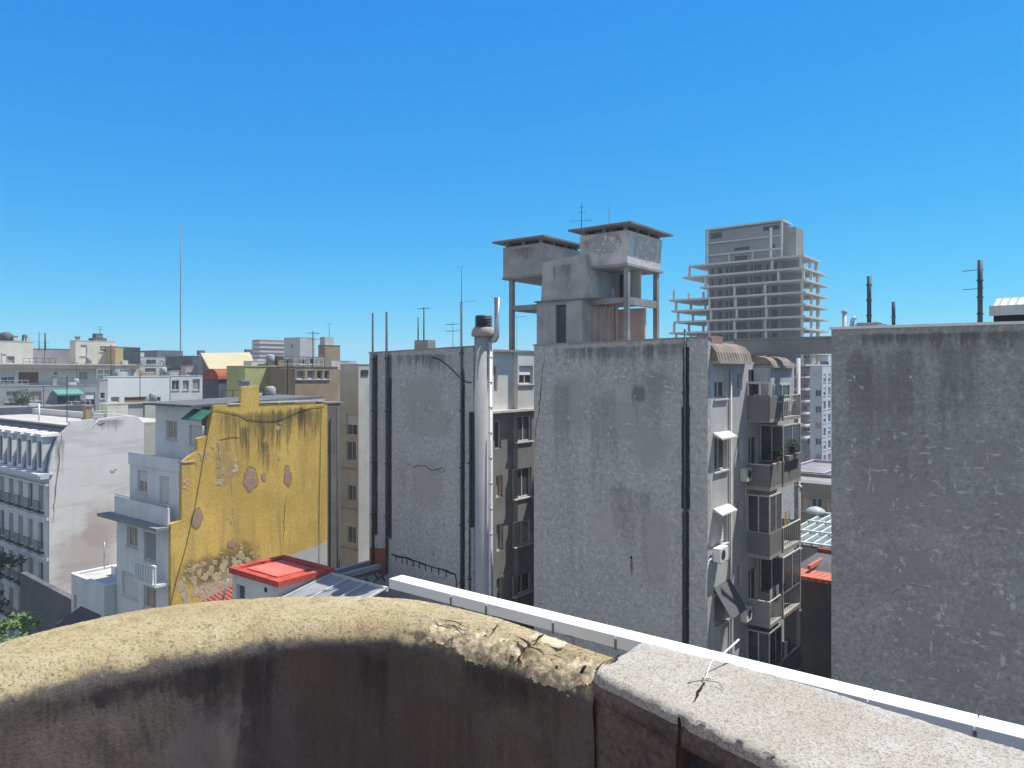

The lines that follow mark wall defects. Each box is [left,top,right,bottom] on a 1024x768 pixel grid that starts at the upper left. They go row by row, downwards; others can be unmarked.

flaking render [194,422,292,495]
flaking render [190,507,204,530]
peeling [177,540,262,604]
crack [432,619,563,659]